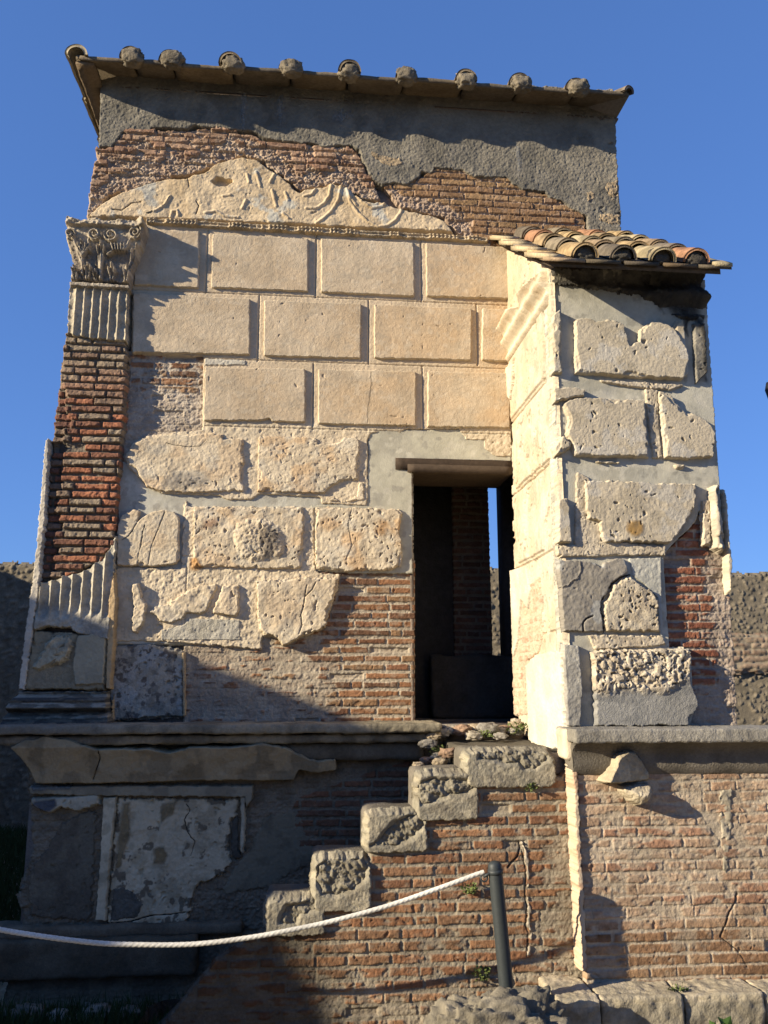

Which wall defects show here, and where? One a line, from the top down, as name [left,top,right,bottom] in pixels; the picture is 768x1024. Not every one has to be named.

flaking render [87,126,586,247]
flaking render [107,796,240,923]
crack [719,893,747,967]